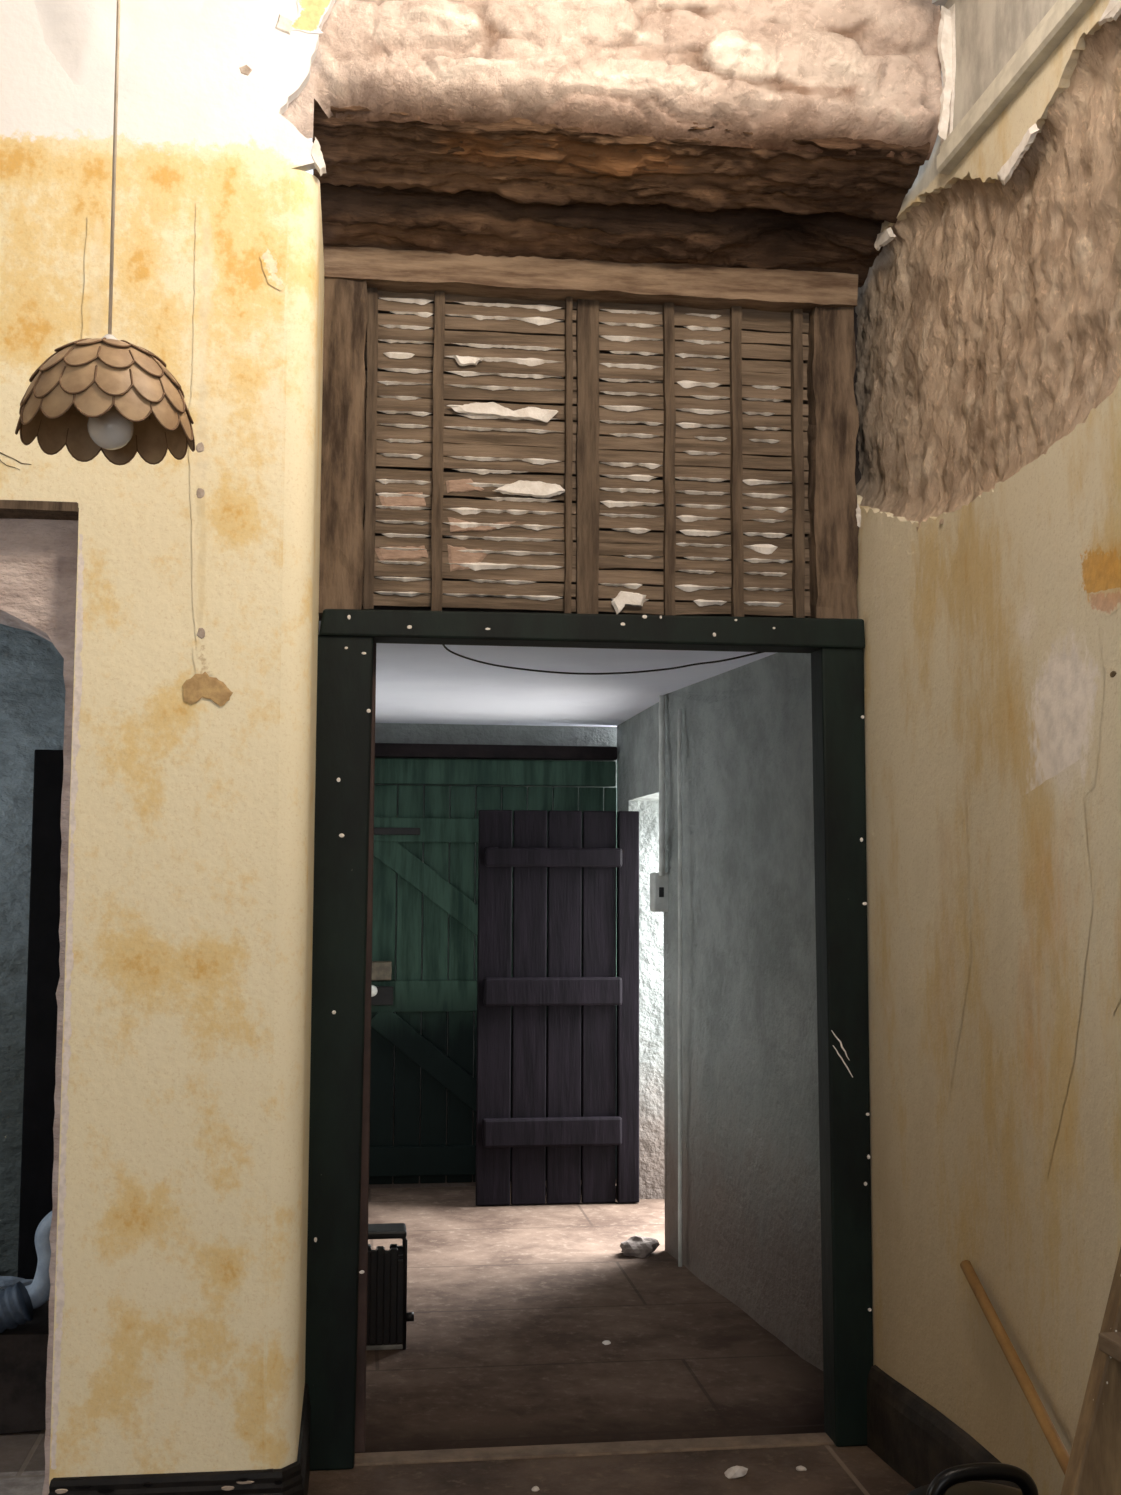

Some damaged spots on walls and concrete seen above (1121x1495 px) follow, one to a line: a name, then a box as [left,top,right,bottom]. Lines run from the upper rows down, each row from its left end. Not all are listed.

spalling [275,0,956,176]